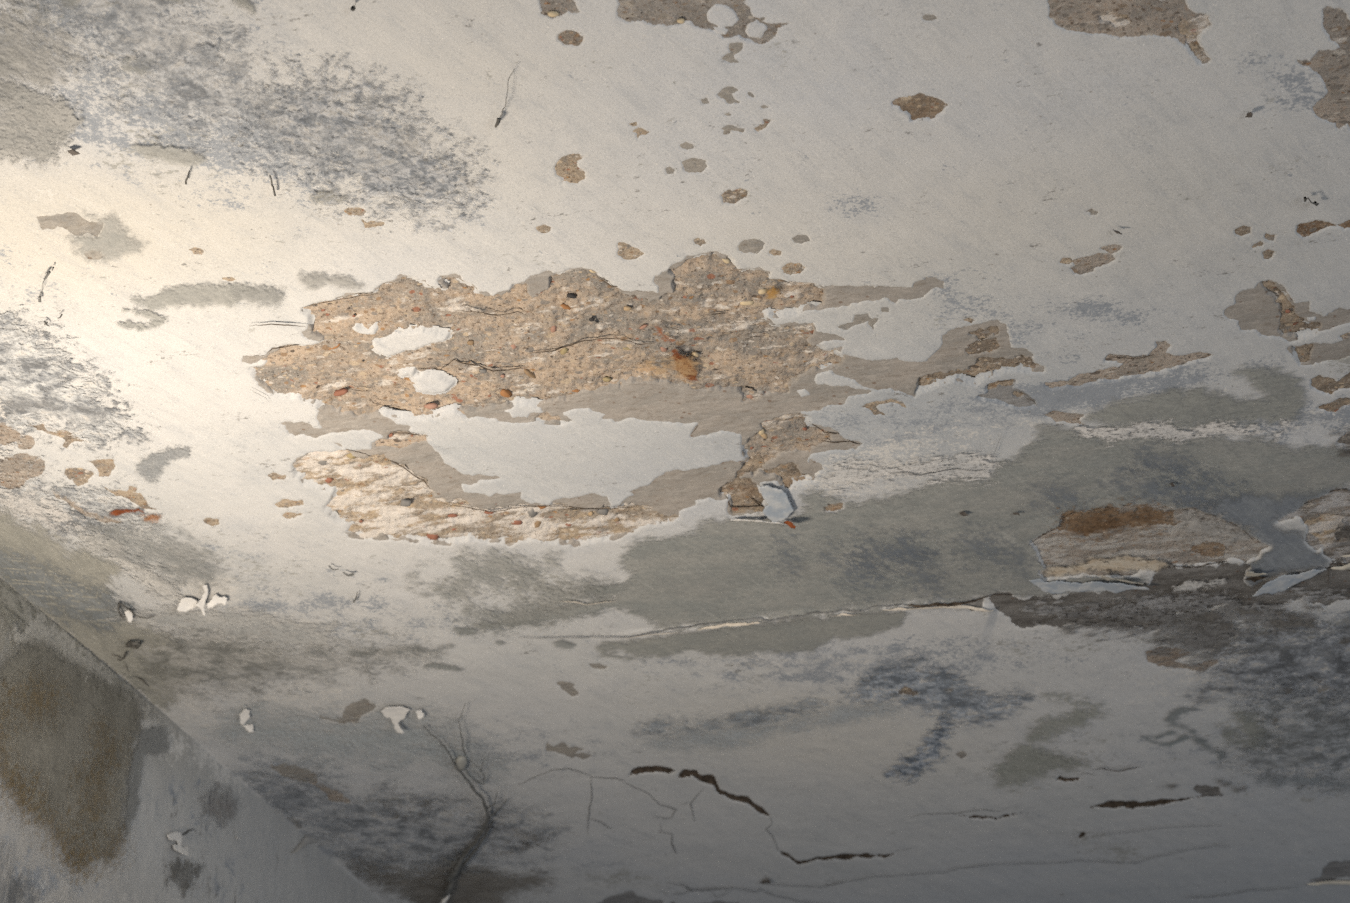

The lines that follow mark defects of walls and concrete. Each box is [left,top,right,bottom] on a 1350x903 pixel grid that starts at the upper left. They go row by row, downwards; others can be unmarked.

water stain [0,0,499,236]
spalling [617,0,789,63]
spalling [1048,0,1211,64]
spalling [1297,6,1350,129]
spalling [242,238,1211,547]
spalling [1224,280,1350,412]
water stain [0,305,572,888]
water stain [404,367,1350,799]
peeling [964,488,1350,672]
water stain [165,856,202,898]
crack [522,766,1022,903]
crack [1026,766,1223,864]